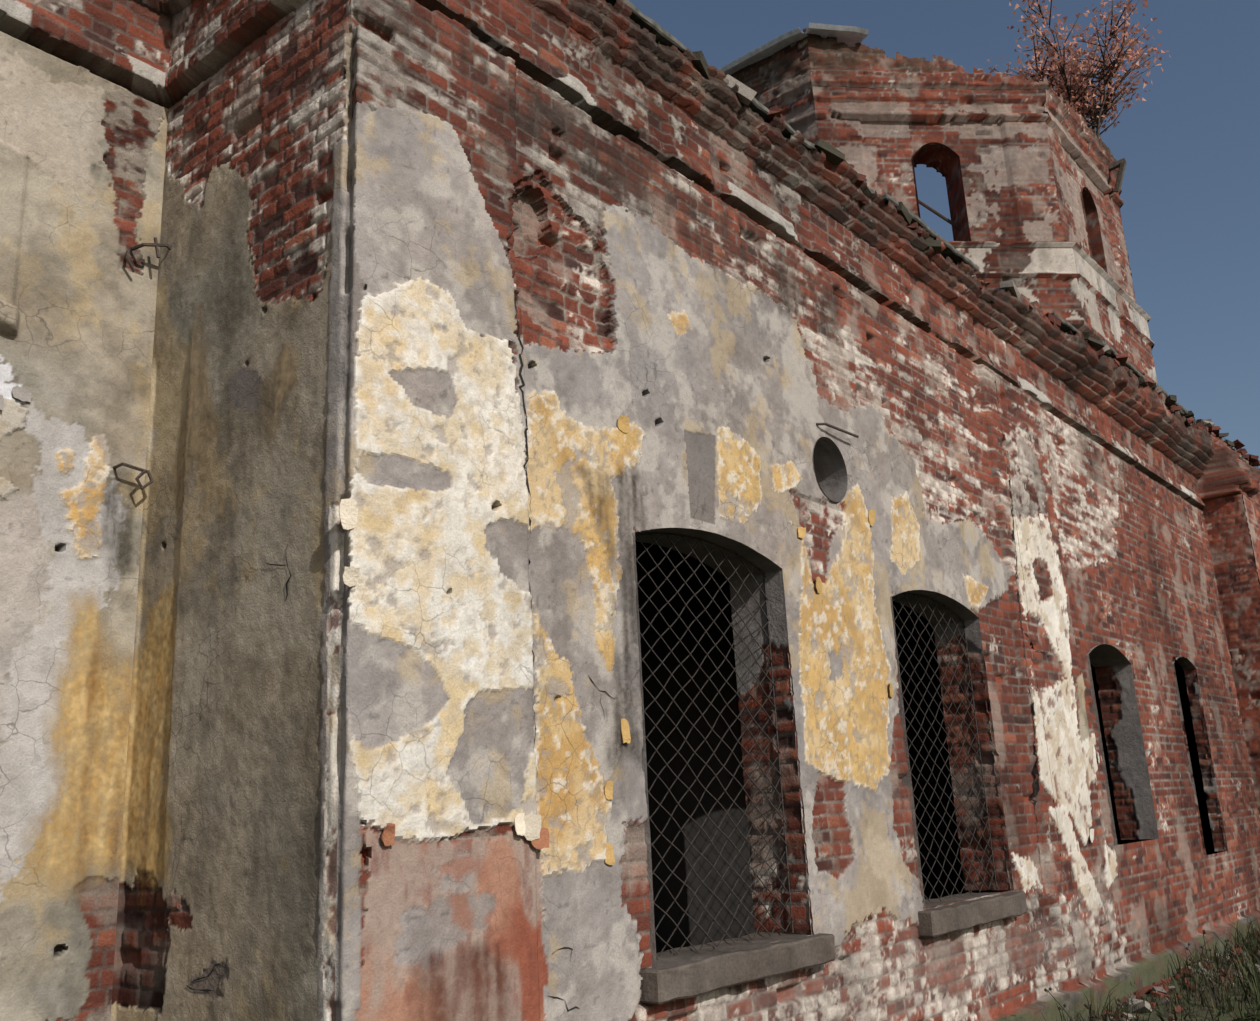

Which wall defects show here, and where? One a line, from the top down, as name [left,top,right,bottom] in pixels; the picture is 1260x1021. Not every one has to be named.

spalling [101,0,1121,594]
peeling [0,353,133,901]
spalling [45,871,192,1021]
spalling [186,957,229,1001]
leakage [430,956,448,1021]
leakage [471,948,505,1021]
peeling [321,276,663,1021]
peeling [717,426,894,878]
spalling [631,513,1127,1021]